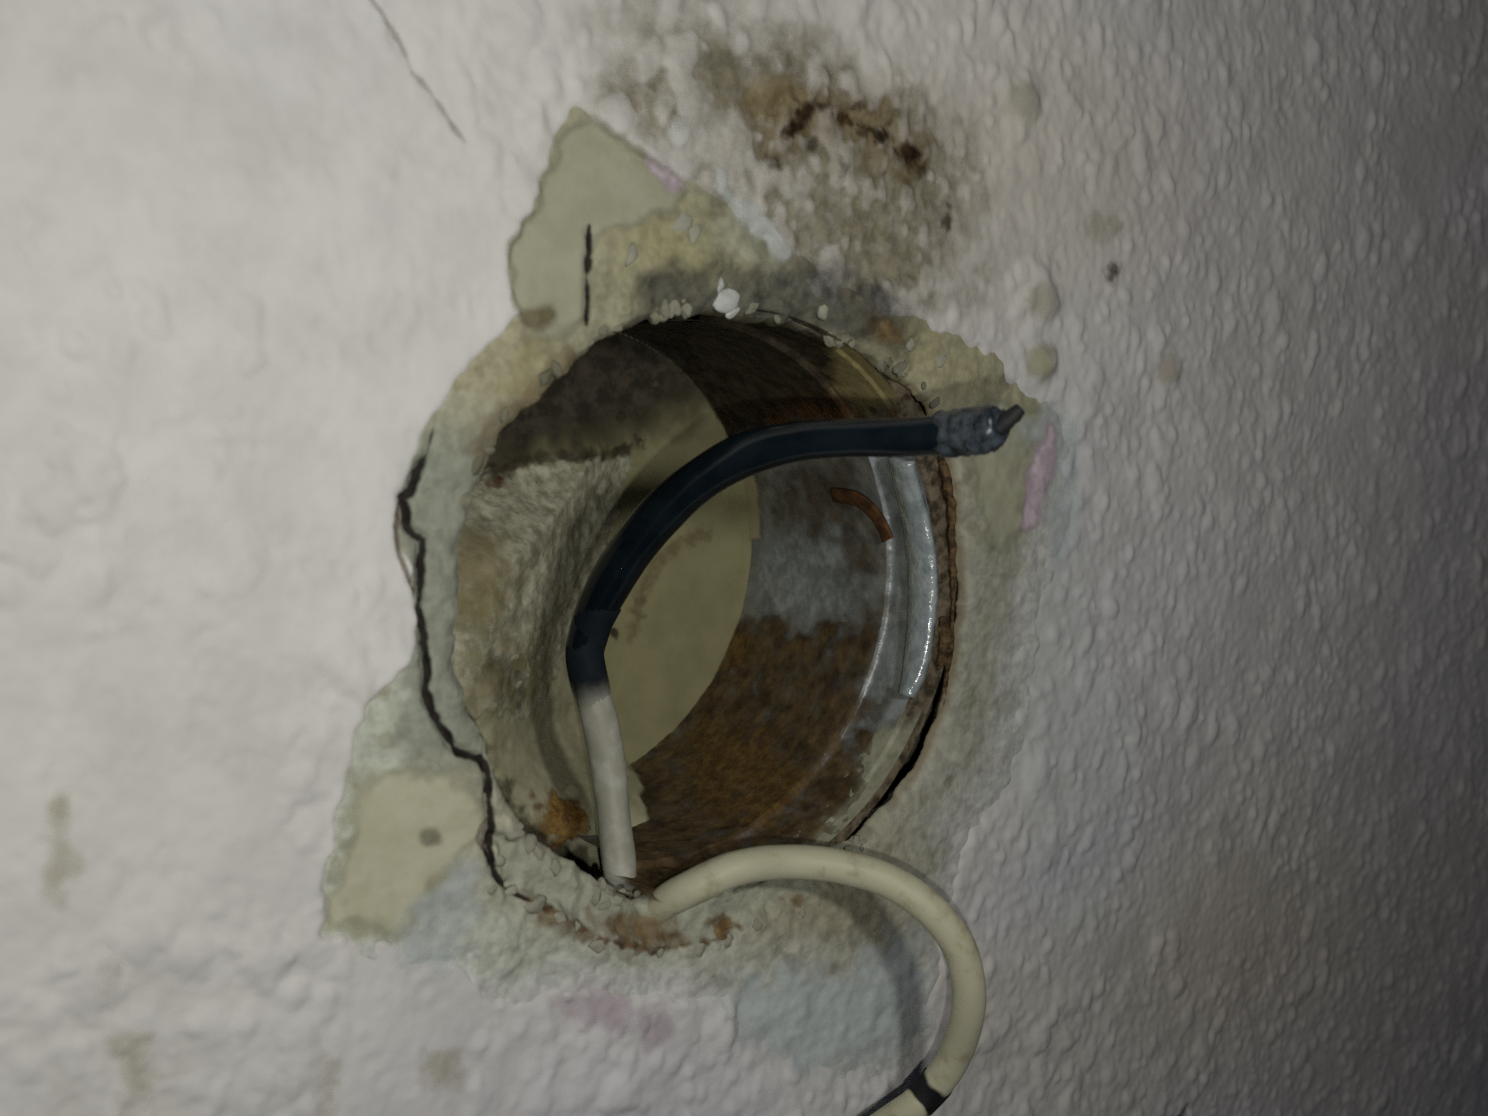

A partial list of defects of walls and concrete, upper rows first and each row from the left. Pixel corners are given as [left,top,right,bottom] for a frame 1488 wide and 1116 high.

flaking render [538,360,562,387]
peeling [509,119,702,338]
leakage [608,69,677,136]
flaking render [711,277,781,324]
peeling [716,168,791,260]
leakage [693,43,955,304]
flaking render [817,303,856,349]
peeling [973,399,1057,553]
crack [394,433,529,901]
peeling [328,768,486,939]
flaking render [487,821,605,954]
corrosion [528,615,878,955]